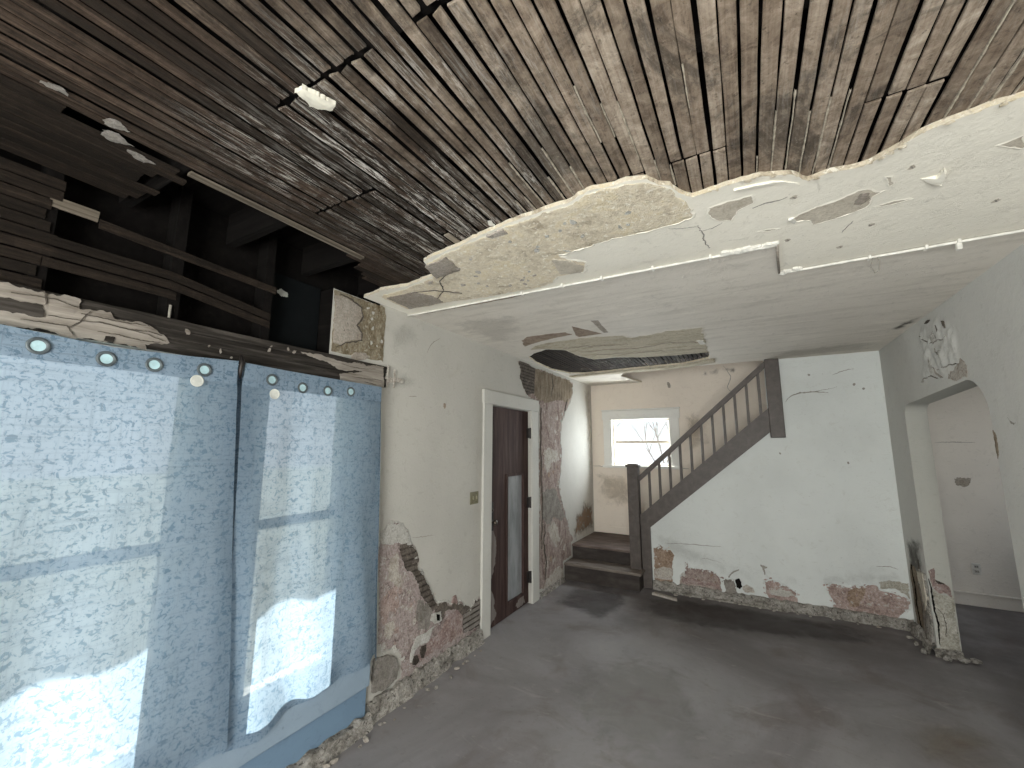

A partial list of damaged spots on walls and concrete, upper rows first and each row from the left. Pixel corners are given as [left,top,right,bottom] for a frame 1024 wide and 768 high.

peeling [0,282,169,351]
spalling [287,180,799,388]
peeling [756,175,914,233]
spalling [518,361,574,590]
spalling [377,520,481,681]
spalling [652,544,800,602]